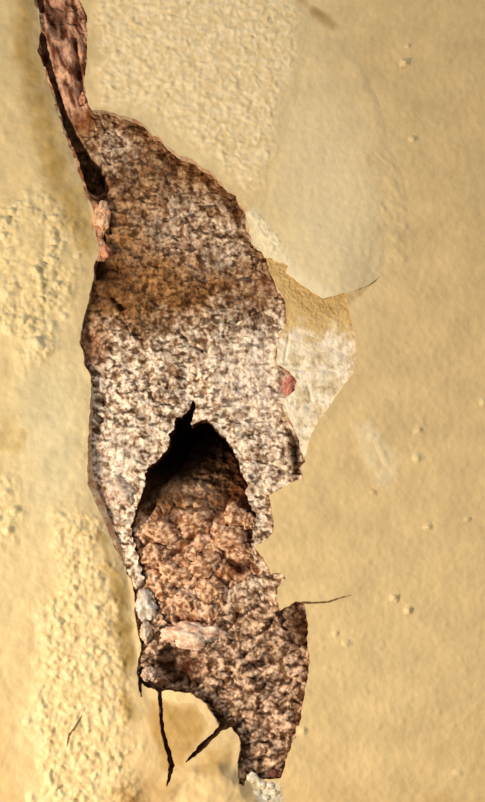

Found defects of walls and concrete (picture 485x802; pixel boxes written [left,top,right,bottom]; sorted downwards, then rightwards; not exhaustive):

spalling [16,0,387,802]
peeling [350,416,402,497]
crack [302,596,346,604]
leakage [91,525,238,802]
leakage [0,667,27,802]
crack [137,667,236,785]
leakage [246,771,285,802]